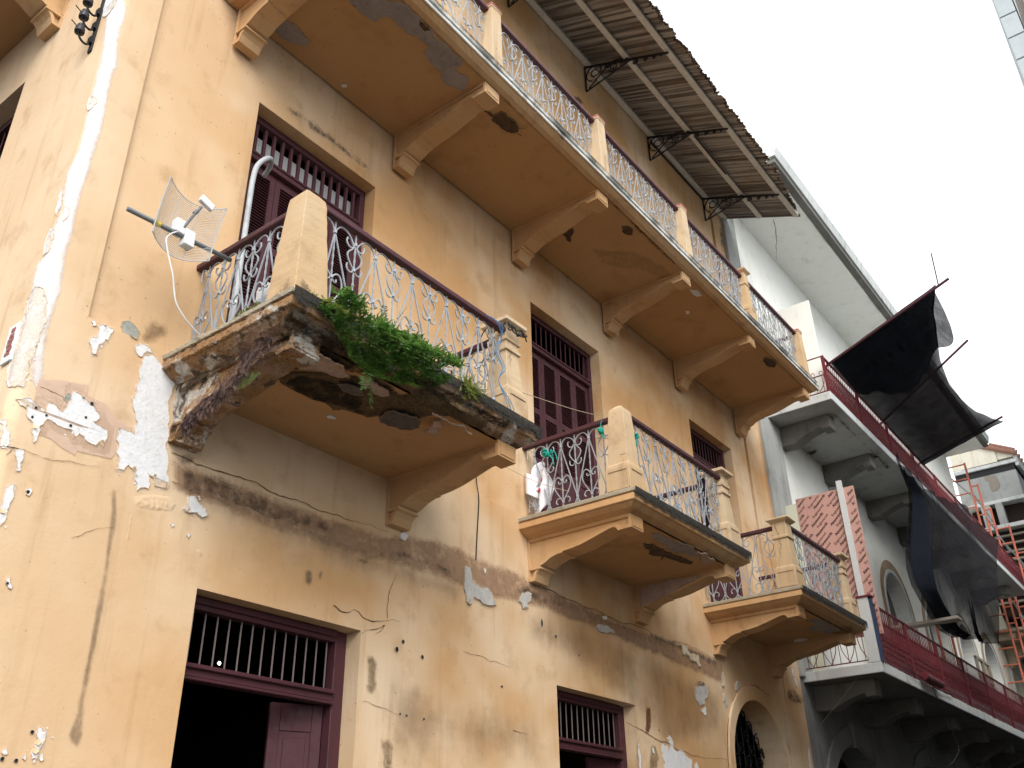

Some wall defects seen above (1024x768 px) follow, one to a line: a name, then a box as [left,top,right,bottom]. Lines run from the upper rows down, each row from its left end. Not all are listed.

spalling [348,0,469,91]
spalling [484,111,519,134]
flaking render [0,0,175,528]
peeling [303,353,390,397]
crack [172,452,384,532]
leakage [635,485,752,560]
spalling [643,533,715,565]
crack [334,574,397,633]
peeling [463,566,497,608]
peeling [518,591,531,608]
peeling [695,683,708,715]
peeling [638,730,699,768]